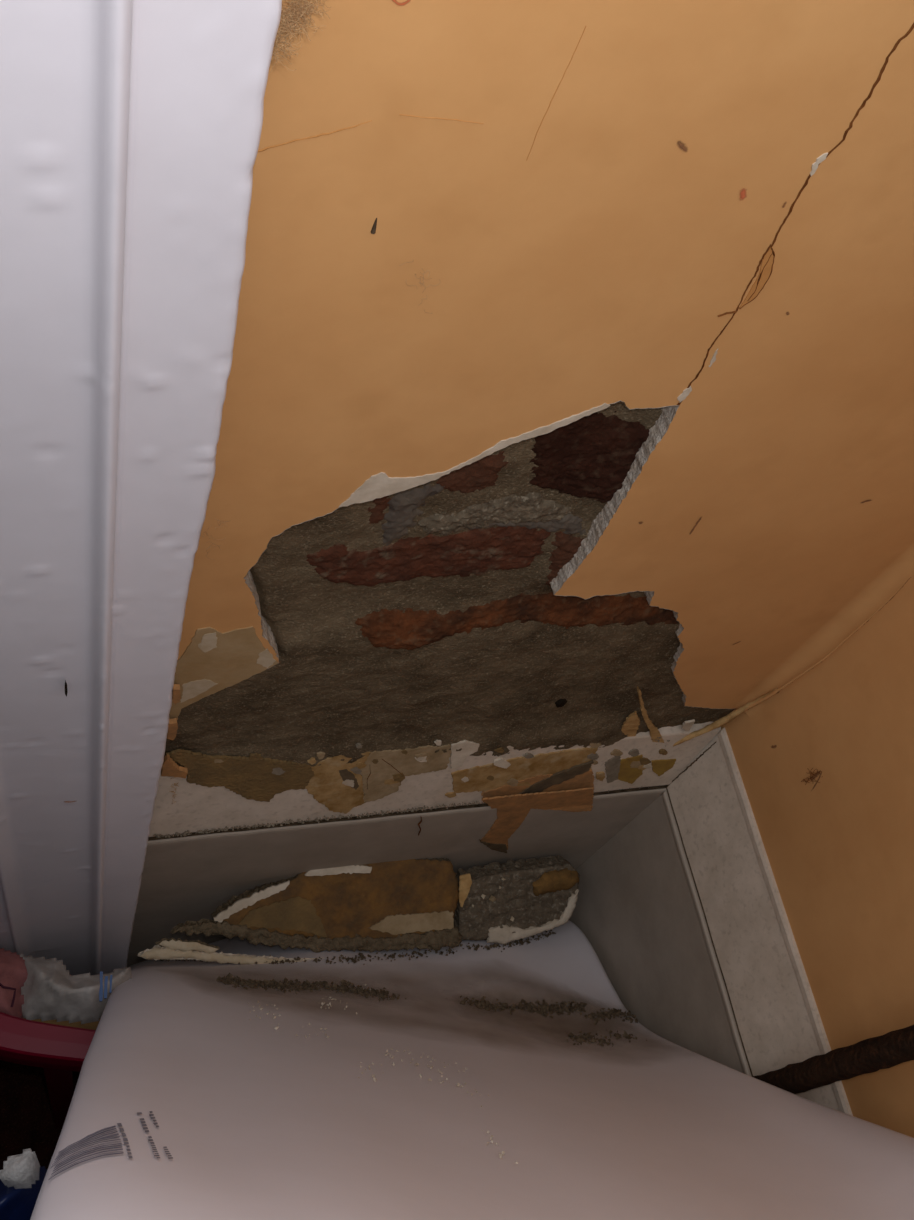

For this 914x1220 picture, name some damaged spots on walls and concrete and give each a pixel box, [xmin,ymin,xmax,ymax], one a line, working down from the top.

crack [677,23,914,405]
flaking render [161,400,735,853]